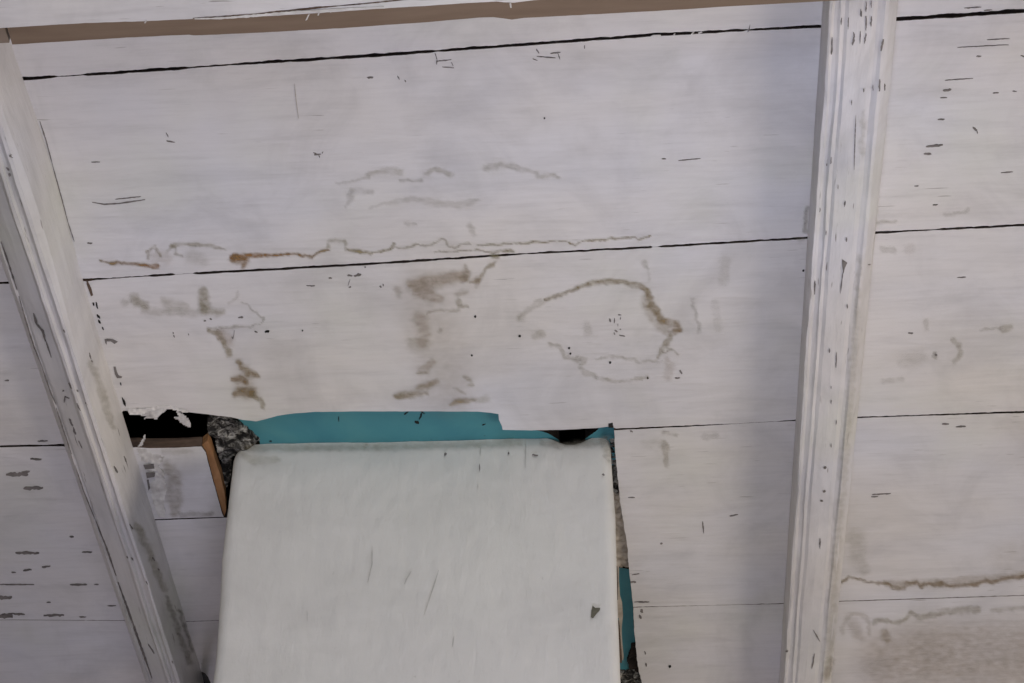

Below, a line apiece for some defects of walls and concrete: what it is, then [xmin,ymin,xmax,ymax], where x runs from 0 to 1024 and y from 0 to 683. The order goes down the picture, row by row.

leakage [230,250,329,267]
leakage [641,288,681,332]
peeling [127,405,191,427]